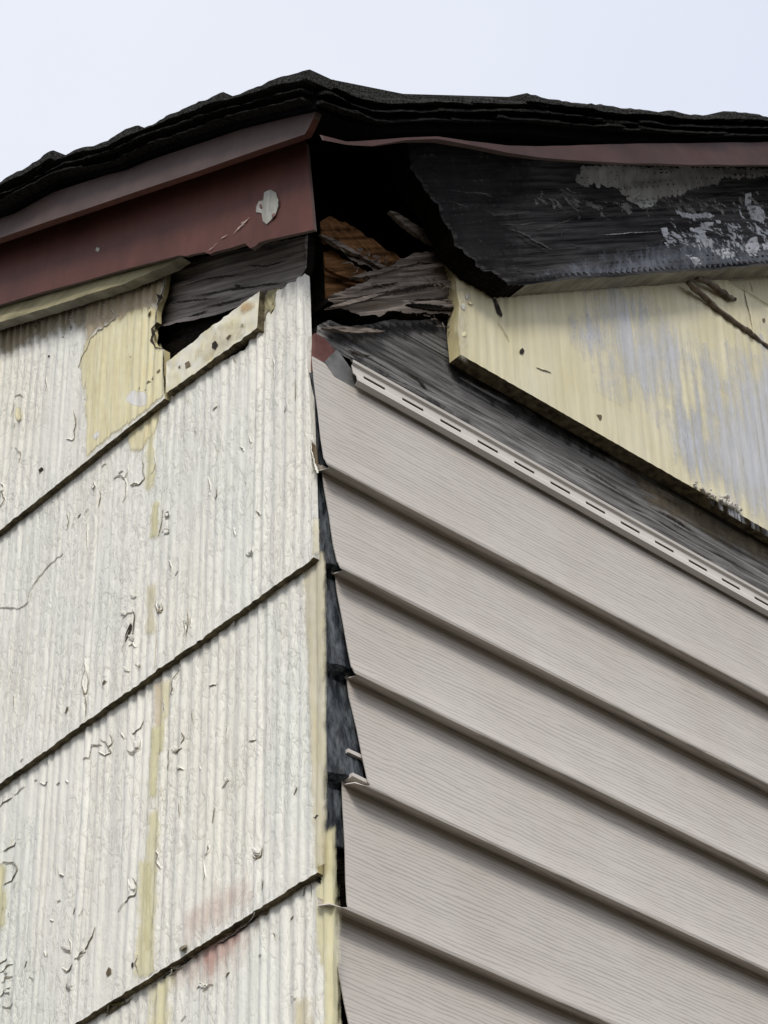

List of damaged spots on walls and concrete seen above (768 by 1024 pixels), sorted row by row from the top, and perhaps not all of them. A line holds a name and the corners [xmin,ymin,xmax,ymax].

peeling [256,190,279,224]
peeling [534,165,768,267]
damp [325,320,448,343]
peeling [78,276,166,488]
damp [351,357,441,408]
damp [448,363,609,461]
damp [621,466,768,558]
peeling [119,585,163,651]
peeling [149,660,182,796]
peeling [134,812,202,1024]
peeling [215,909,269,947]
peeling [105,998,131,1016]